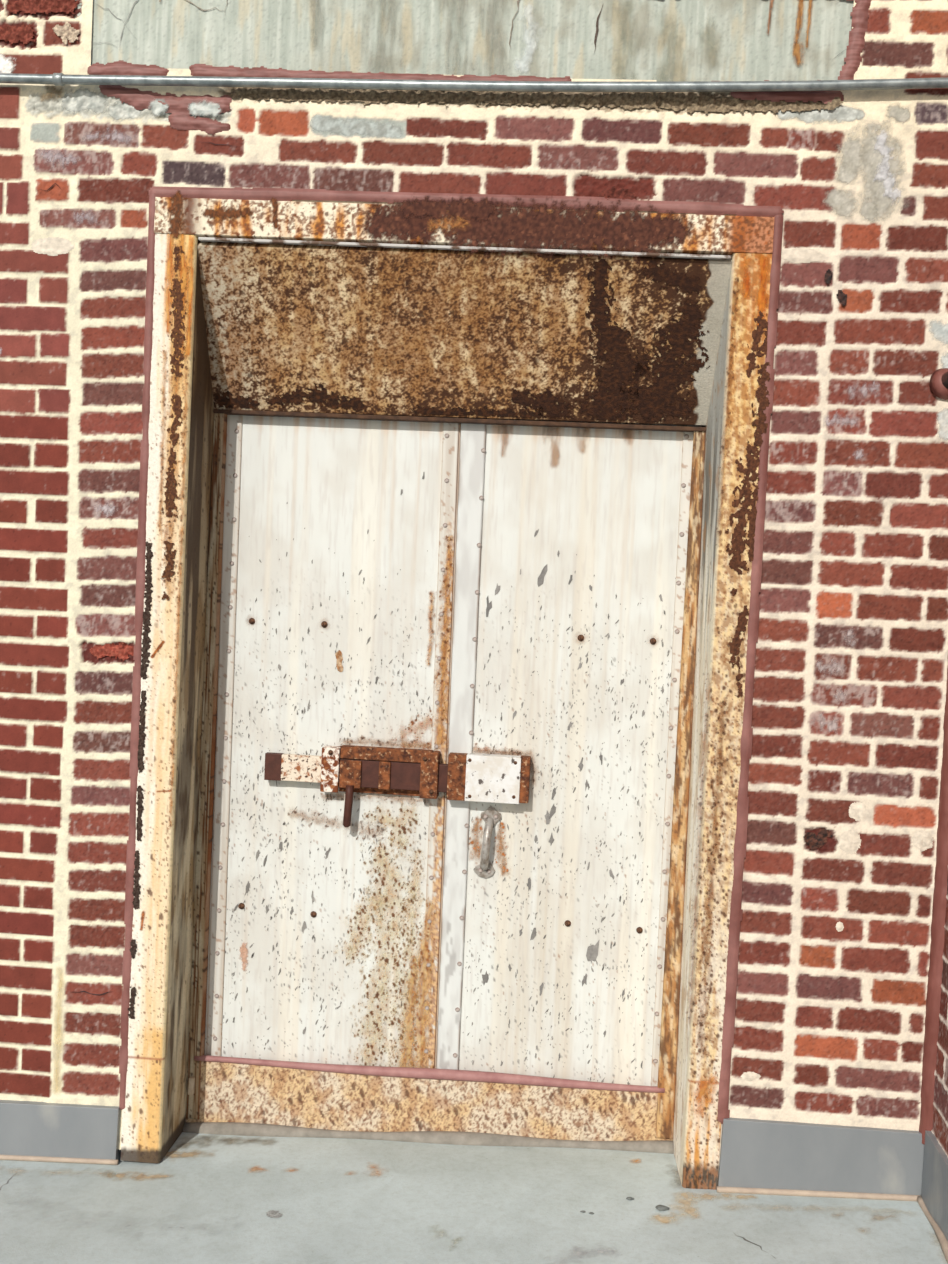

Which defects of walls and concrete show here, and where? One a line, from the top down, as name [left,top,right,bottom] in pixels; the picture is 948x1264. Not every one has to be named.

rust [793,0,812,65]
efflorescence [874,131,901,199]
rust [203,208,252,220]
rust [270,198,278,228]
rust [363,196,710,450]
rust [725,256,767,387]
rust [151,191,194,658]
rust [213,383,367,412]
rust [687,672,726,1055]
rust [321,792,435,1068]
rust [696,1077,715,1103]